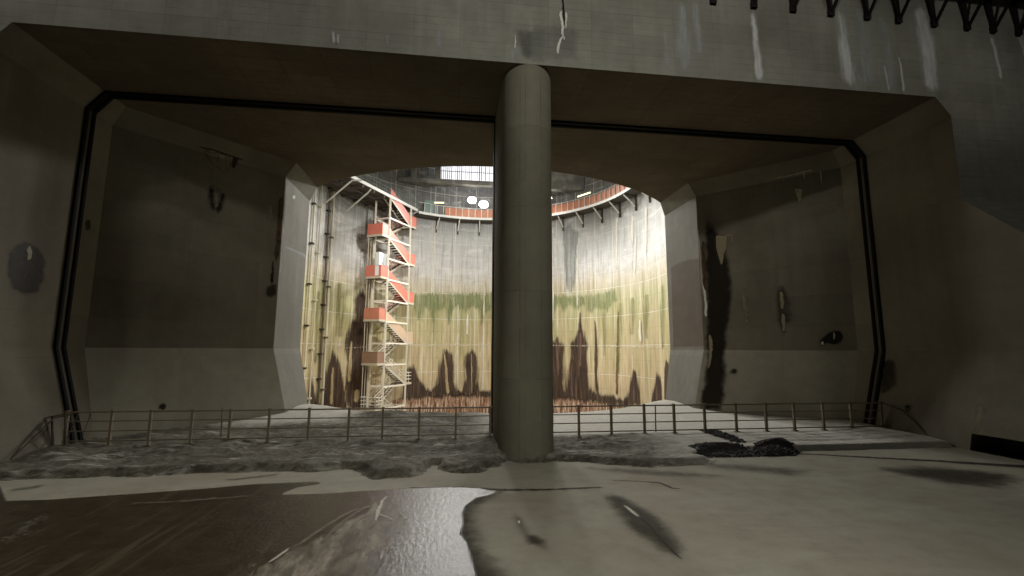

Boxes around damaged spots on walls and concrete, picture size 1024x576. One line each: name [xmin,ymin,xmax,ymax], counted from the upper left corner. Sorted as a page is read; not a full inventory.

leakage [751,14,763,80]
leakage [838,14,858,86]
leakage [915,7,938,91]
leakage [9,243,45,293]
leakage [358,221,381,266]
leakage [307,279,381,408]
leakage [403,283,491,400]
leakage [552,227,669,408]
leakage [702,224,748,410]